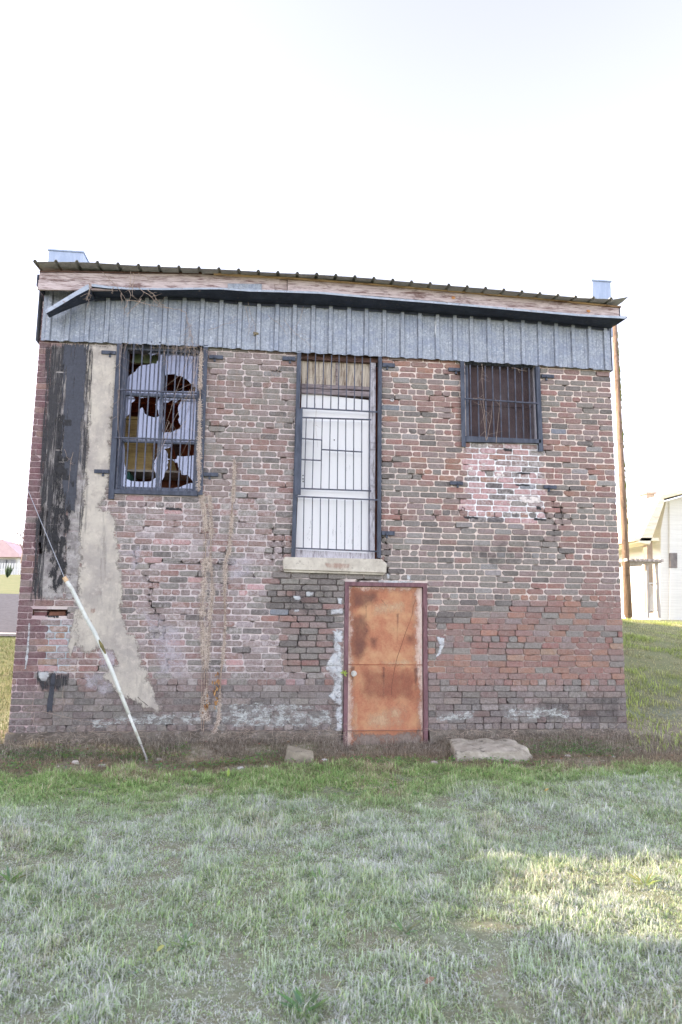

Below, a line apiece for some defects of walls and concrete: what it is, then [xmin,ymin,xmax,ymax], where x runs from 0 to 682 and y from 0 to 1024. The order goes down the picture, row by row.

flaking render [36,342,159,712]
water stain [215,702,330,728]
corrosion [349,586,422,745]